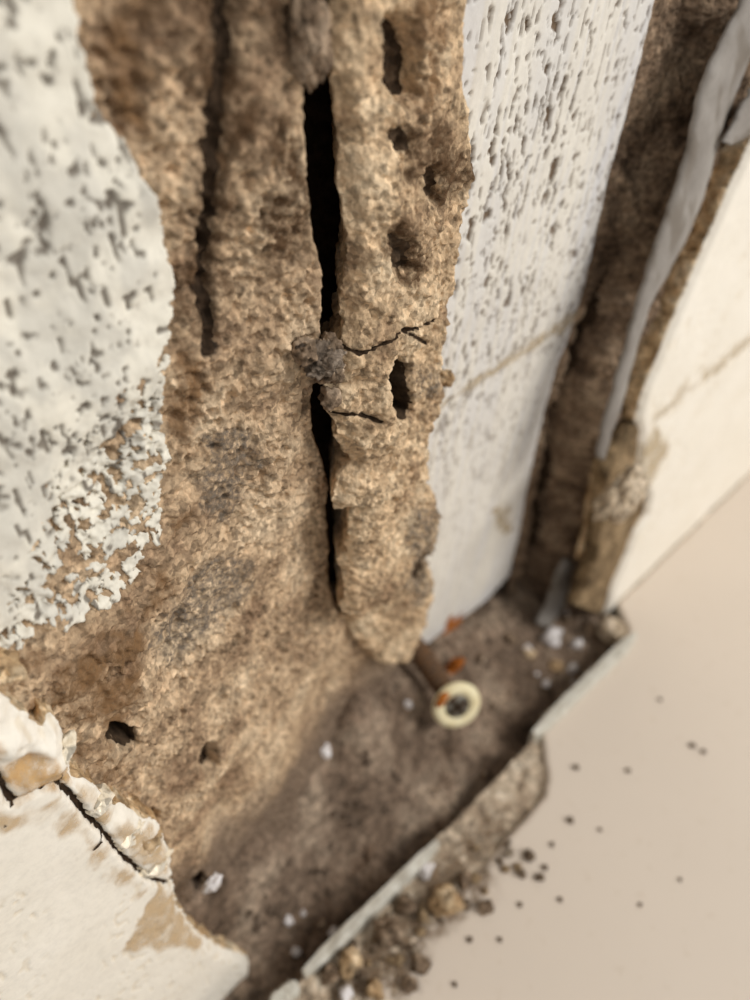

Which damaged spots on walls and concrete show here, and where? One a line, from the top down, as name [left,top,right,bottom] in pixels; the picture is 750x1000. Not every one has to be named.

crack [191,0,232,355]
crack [302,74,341,323]
hole [423,167,436,196]
flaking render [0,0,413,907]
crack [310,383,384,587]
crack [342,318,436,356]
hole [411,556,422,581]
flaking render [440,369,455,388]
flaking render [507,0,750,614]
crack [0,770,167,884]